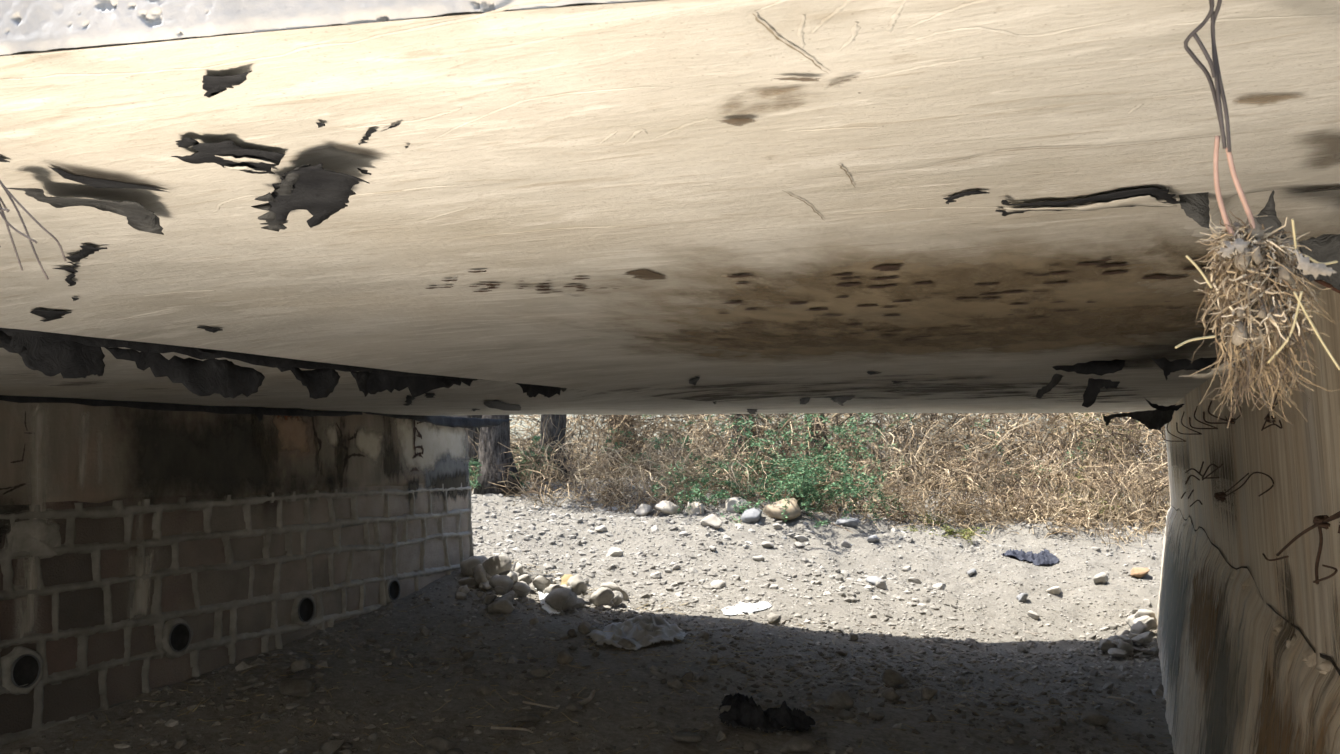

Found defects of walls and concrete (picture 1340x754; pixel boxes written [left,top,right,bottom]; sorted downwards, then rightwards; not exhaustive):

peeling [202,71,252,98]
peeling [7,166,168,235]
peeling [171,123,401,232]
water stain [127,409,305,506]
water stain [130,554,152,620]
rust [1186,551,1227,706]
rust [1249,649,1339,754]